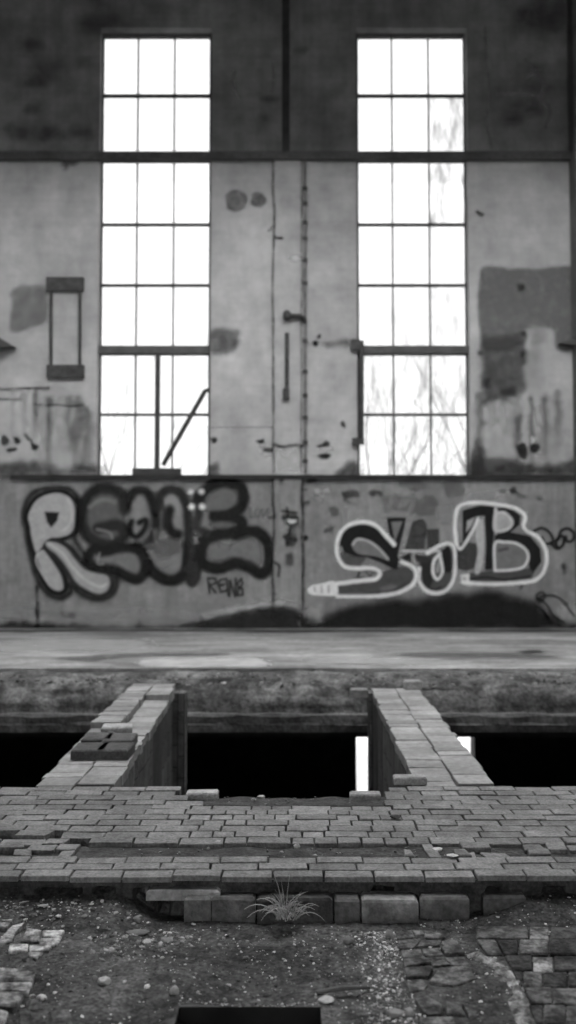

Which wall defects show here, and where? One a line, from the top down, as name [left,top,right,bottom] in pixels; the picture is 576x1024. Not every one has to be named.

damp [227,191,266,211]
damp [11,286,46,331]
damp [209,329,238,353]
peeling [478,267,572,402]
damp [34,393,82,439]
spalling [517,436,540,459]